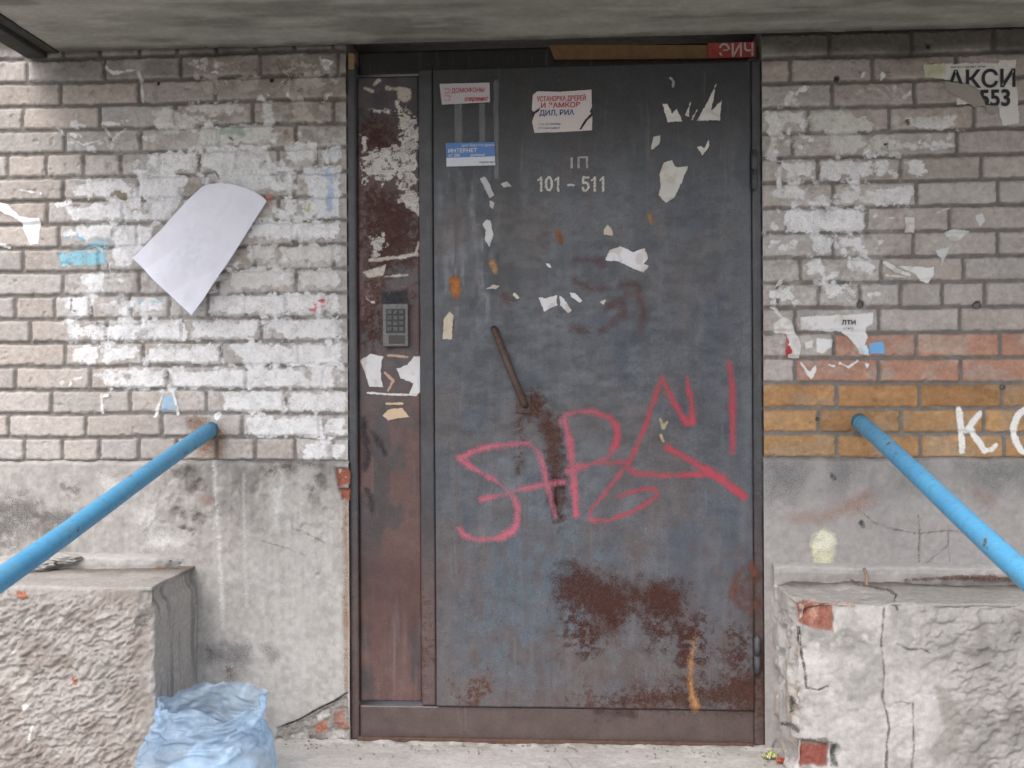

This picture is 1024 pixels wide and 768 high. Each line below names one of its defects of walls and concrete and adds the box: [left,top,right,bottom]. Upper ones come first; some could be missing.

corrosion [357,107,401,161]
corrosion [357,175,419,362]
flaking render [258,460,351,506]
corrosion [510,386,572,535]
corrosion [546,557,765,724]
crack [796,625,829,691]
flaking render [796,597,855,632]
crack [848,508,1012,768]
crack [276,692,349,729]
flaking render [771,695,839,767]